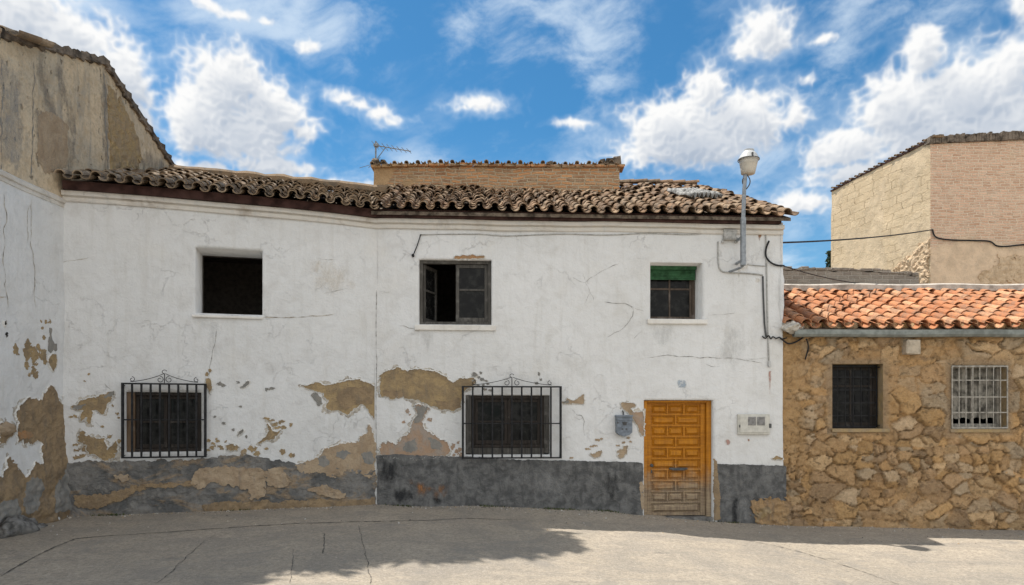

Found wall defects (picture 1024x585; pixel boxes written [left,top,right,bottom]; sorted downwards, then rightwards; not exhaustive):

crack [0,197,36,306]
crack [578,264,643,337]
crack [649,355,761,367]
peeling [0,319,492,527]
peeling [585,401,646,459]